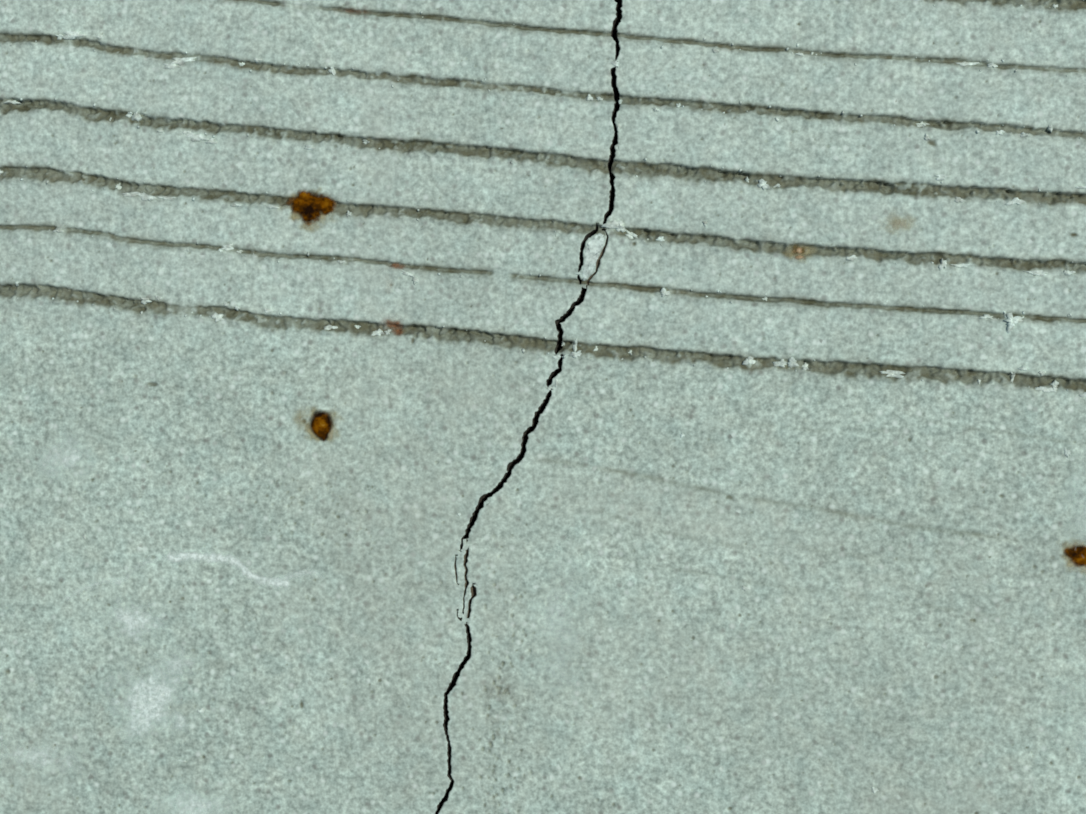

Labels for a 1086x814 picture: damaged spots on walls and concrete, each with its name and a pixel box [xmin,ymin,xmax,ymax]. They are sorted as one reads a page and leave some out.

corrosion [287,191,335,230]
corrosion [299,409,335,441]
crack [435,0,623,814]
corrosion [1064,542,1086,572]